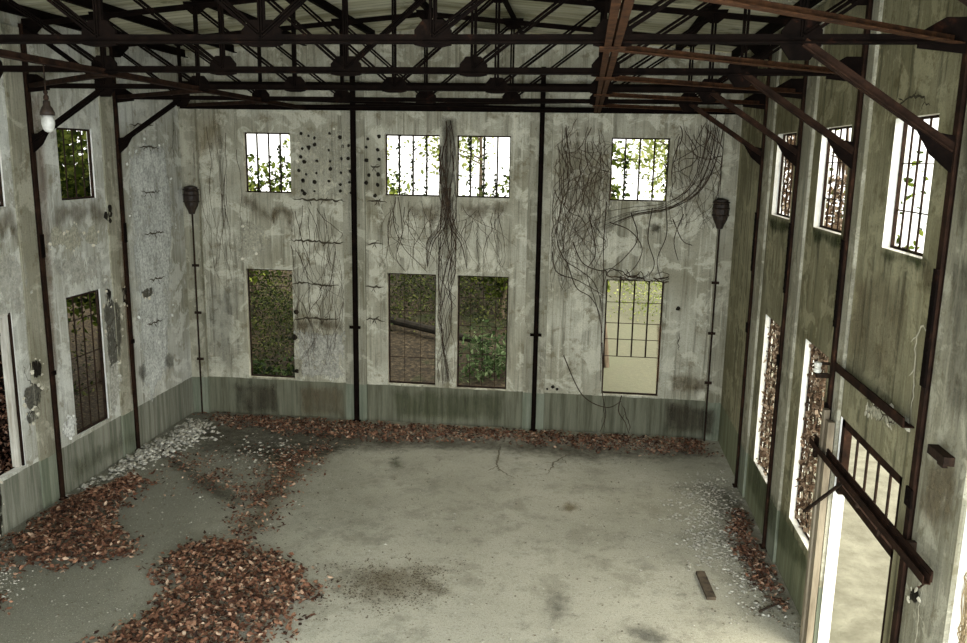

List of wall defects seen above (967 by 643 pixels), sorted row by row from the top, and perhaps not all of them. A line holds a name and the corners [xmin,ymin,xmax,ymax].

peeling [126,138,177,399]
flaking render [83,278,128,366]
flaking render [22,358,44,426]